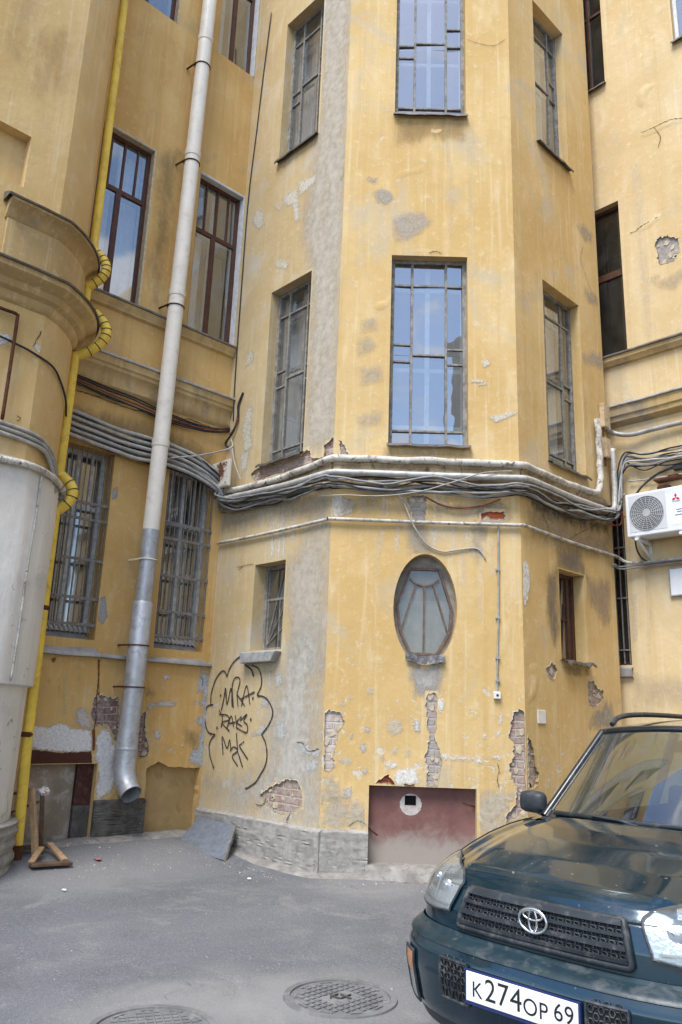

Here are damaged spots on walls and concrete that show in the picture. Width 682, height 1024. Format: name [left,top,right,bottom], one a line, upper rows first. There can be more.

peeling [275,174,317,221]
flaking render [655,235,681,265]
flaking render [240,407,350,481]
flaking render [75,693,120,746]
flaking render [138,701,176,759]
flaking render [545,661,557,681]
flaking render [587,679,604,709]
flaking render [259,698,370,828]
flaking render [376,691,539,832]